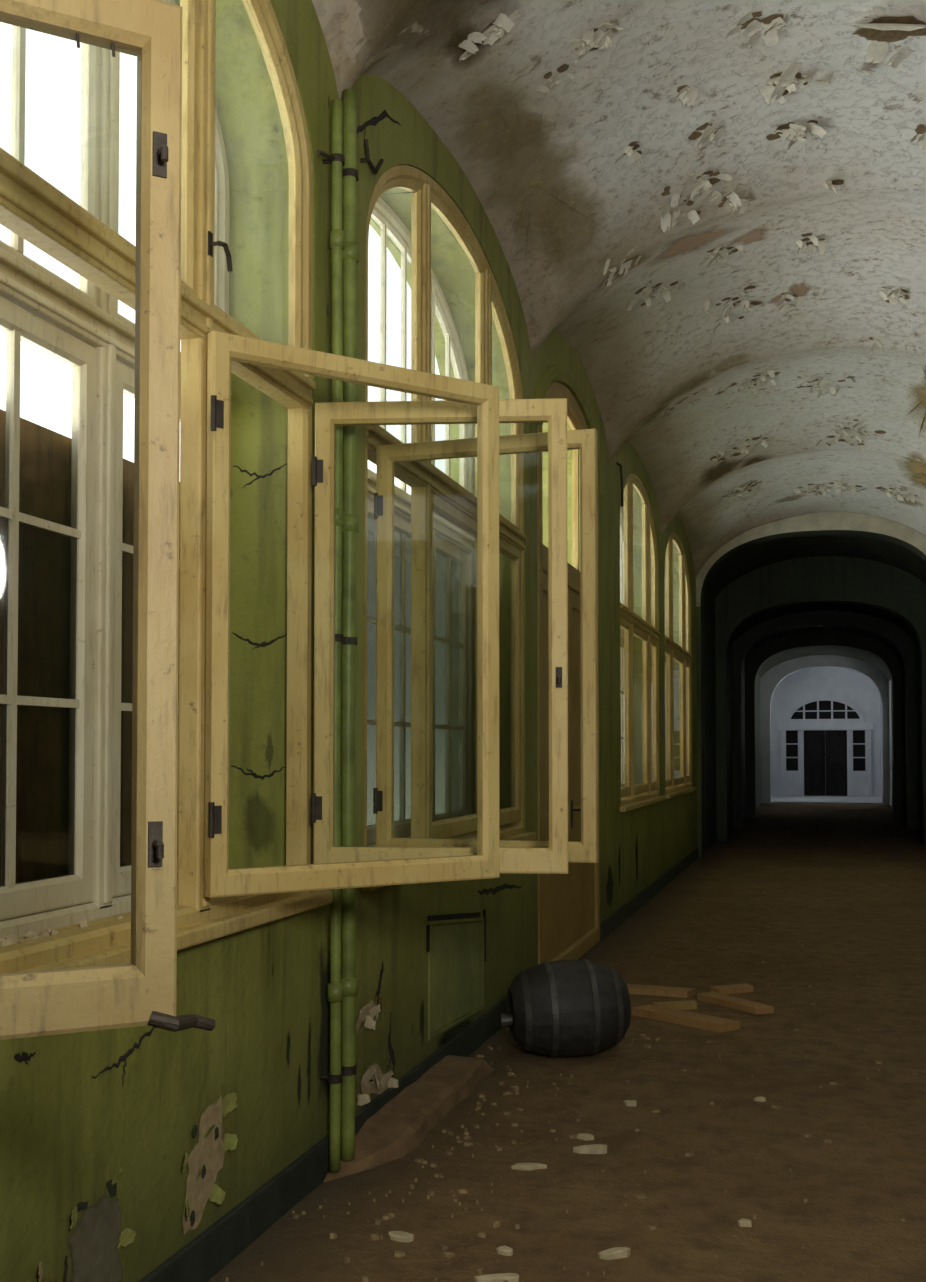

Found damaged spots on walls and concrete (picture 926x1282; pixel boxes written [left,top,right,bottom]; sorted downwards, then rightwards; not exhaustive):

peeling [459,9,522,62]
peeling [724,12,787,48]
peeling [850,16,926,75]
peeling [759,60,831,104]
crack [357,110,401,139]
peeling [766,120,828,150]
peeling [658,170,755,232]
crack [232,464,288,487]
crack [232,632,287,650]
crack [231,766,287,780]
crack [92,1027,157,1087]
peeling [182,1092,238,1236]